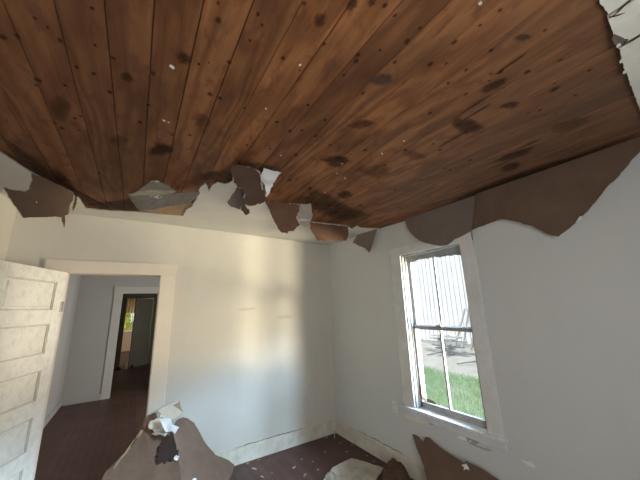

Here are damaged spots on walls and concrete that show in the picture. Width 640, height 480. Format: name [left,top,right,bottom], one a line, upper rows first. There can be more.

water stain [441,53,526,146]
water stain [18,149,96,202]
peeling [260,168,281,197]
water stain [323,156,348,166]
peeling [128,180,200,215]
peeling [297,203,313,227]
water stain [305,191,364,220]